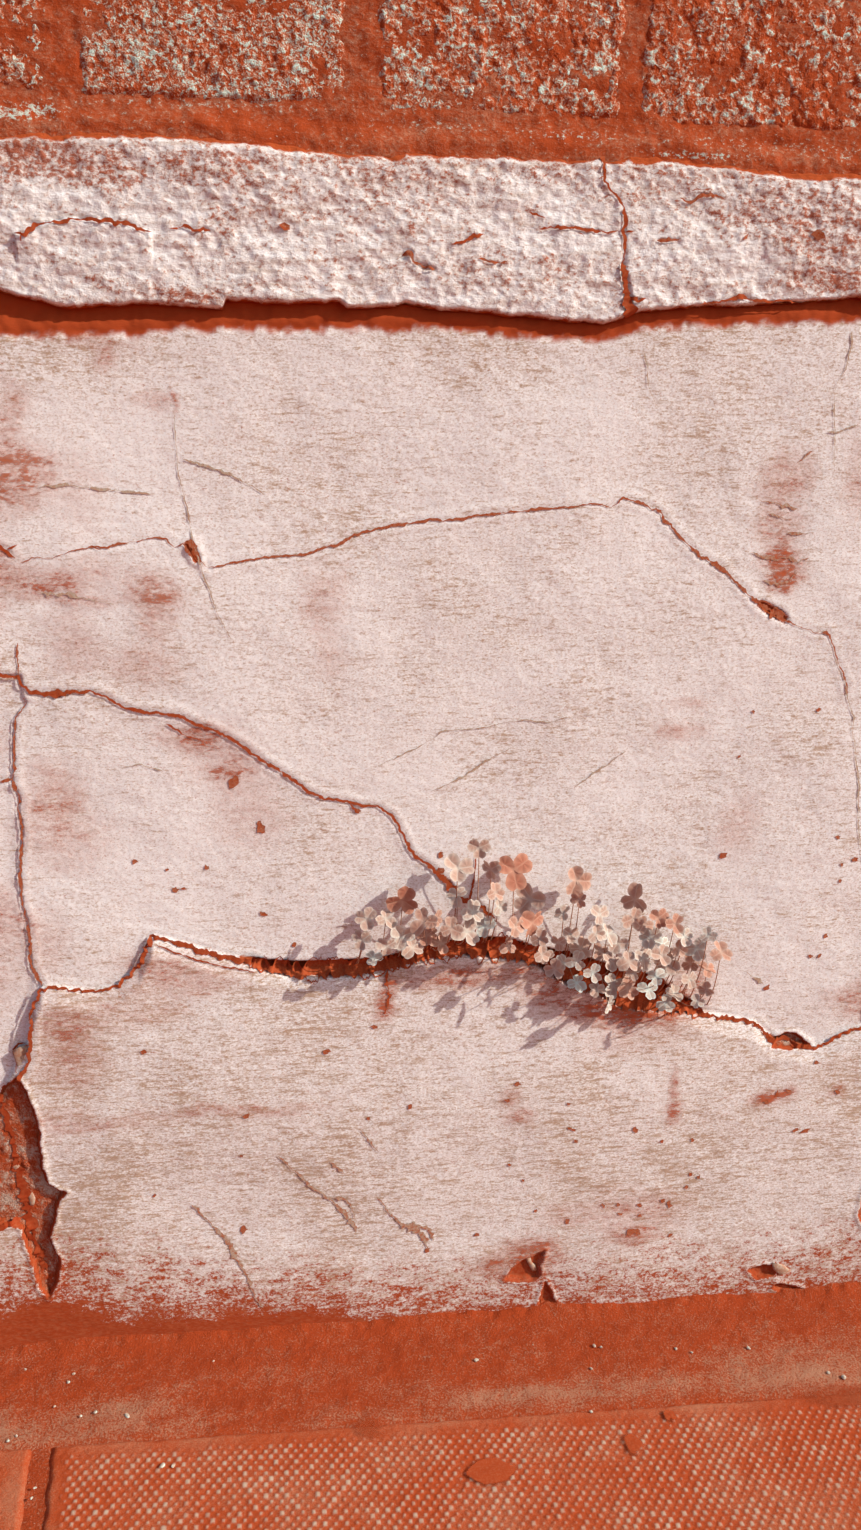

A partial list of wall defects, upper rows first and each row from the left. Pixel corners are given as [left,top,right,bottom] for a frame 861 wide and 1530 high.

crack [529,156,724,404]
crack [0,415,861,847]
crack [0,643,861,1082]
spalling [0,1045,62,1293]